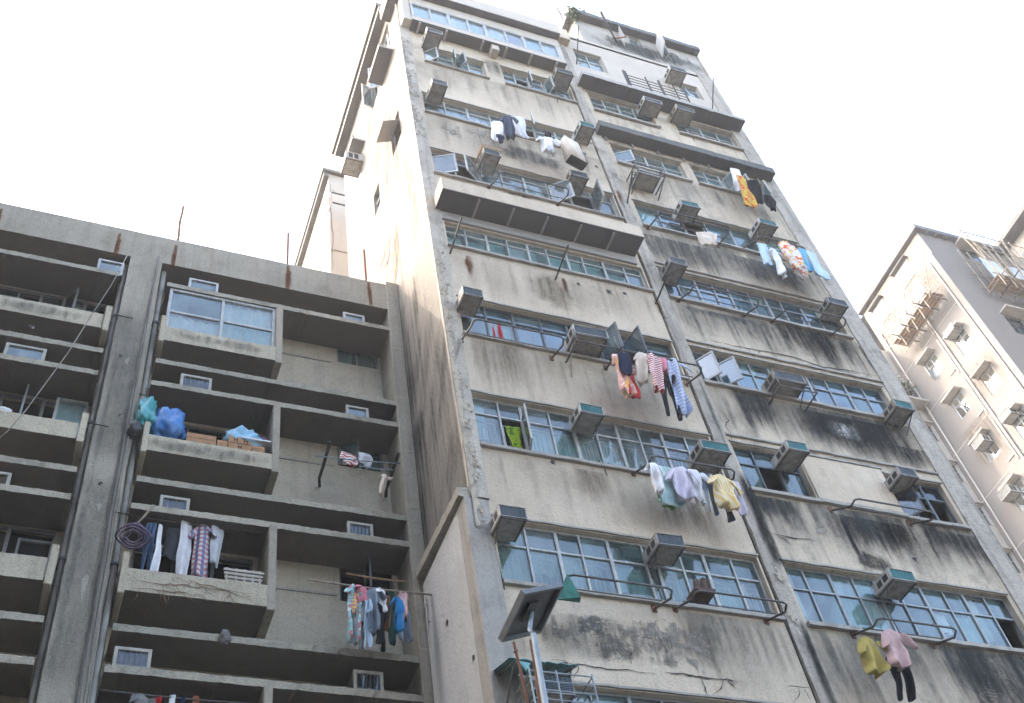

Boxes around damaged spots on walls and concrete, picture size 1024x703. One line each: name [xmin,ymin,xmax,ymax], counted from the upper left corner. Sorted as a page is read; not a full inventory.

water stain [649,235,704,263]
water stain [716,247,796,284]
water stain [713,312,861,364]
water stain [733,390,789,424]
water stain [799,405,924,464]
water stain [809,504,987,569]
crack [553,659,737,694]